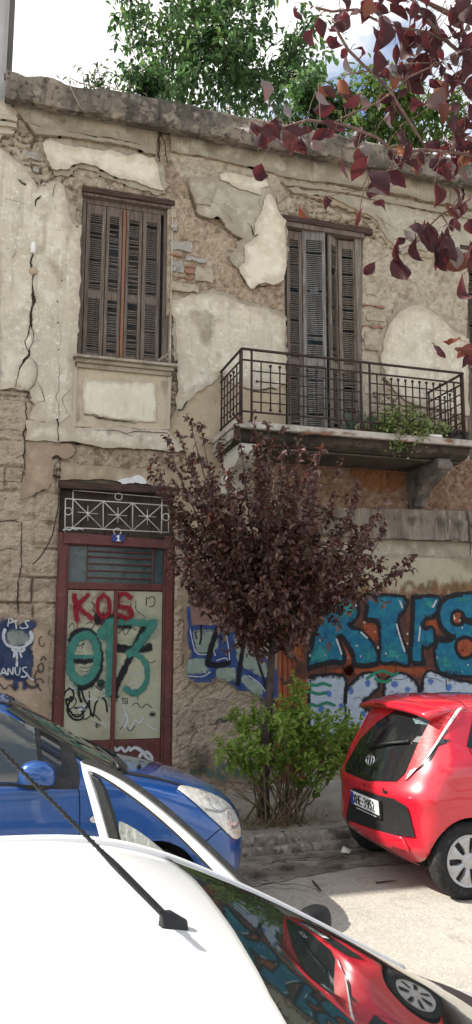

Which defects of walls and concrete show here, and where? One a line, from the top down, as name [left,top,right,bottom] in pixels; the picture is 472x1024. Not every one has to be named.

crack [157,131,168,164]
crack [0,253,165,483]
spalling [61,443,184,473]
flaking render [0,115,469,438]